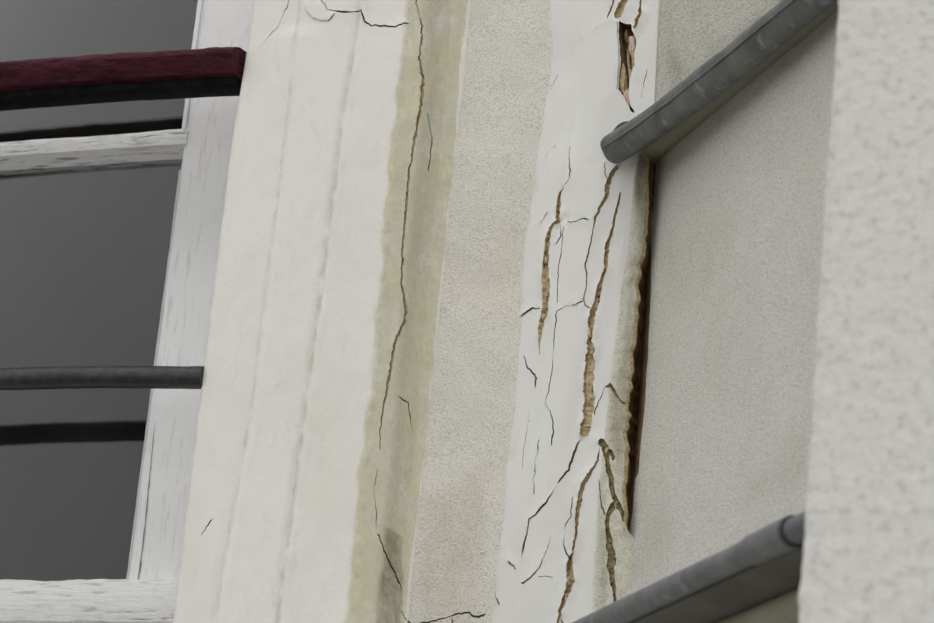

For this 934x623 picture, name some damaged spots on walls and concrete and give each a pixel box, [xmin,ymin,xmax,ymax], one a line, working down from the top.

crack [607,0,642,29]
spalling [618,21,636,113]
crack [313,0,500,623]
crack [508,146,656,623]